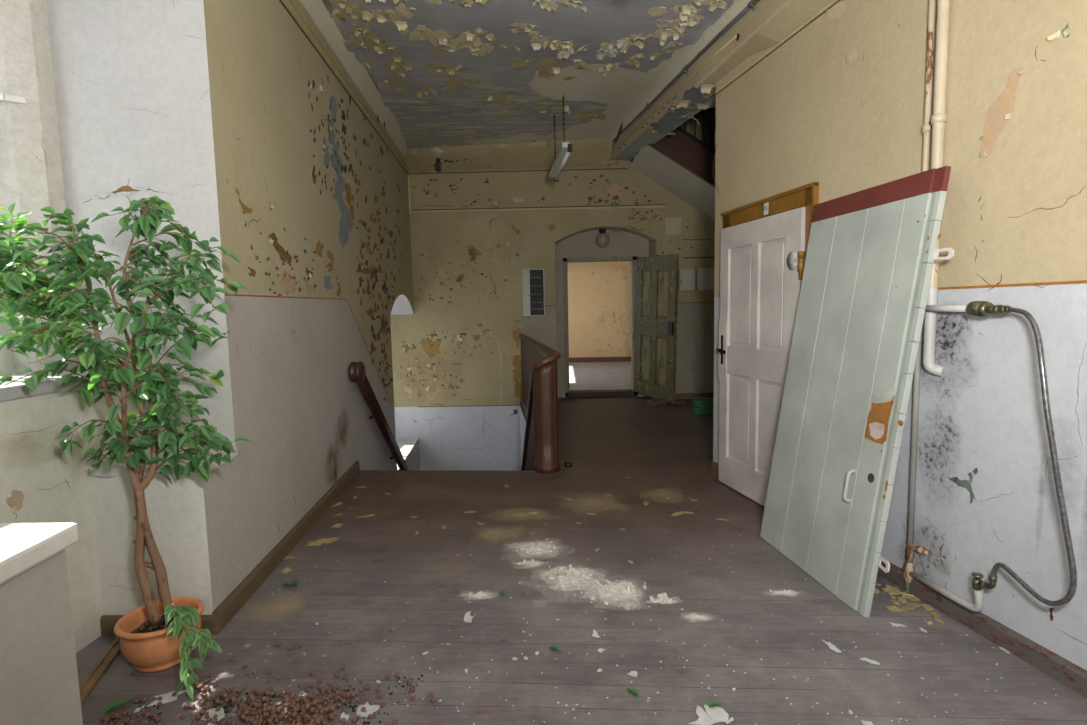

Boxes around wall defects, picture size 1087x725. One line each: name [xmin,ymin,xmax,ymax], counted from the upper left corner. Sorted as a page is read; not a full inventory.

peeling [979,65,1025,158]
peeling [235,187,254,227]
peeling [248,0,733,414]
peeling [6,490,25,511]